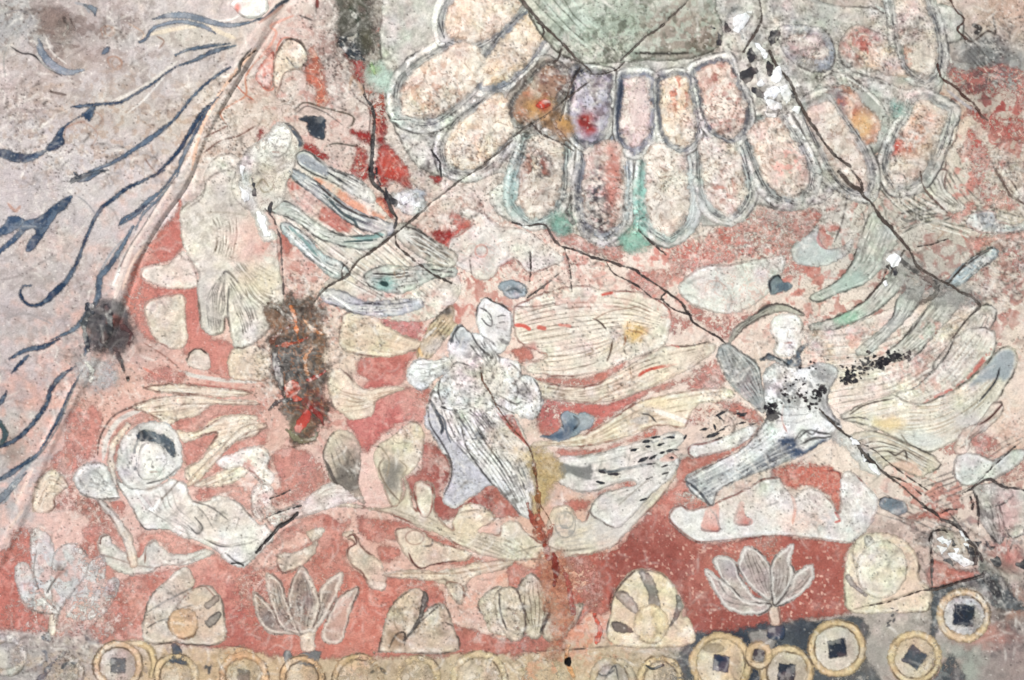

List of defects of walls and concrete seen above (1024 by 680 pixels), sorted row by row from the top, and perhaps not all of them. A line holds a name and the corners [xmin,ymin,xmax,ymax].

spalling [711,7,752,46]
spalling [740,30,803,117]
crack [312,0,686,305]
crack [742,0,993,338]
crack [266,210,284,295]
crack [511,222,726,344]
leakage [76,302,133,391]
peeling [764,350,911,421]
crack [480,367,549,518]
crack [231,490,302,566]
crack [819,408,1024,606]
spalling [933,528,1002,600]